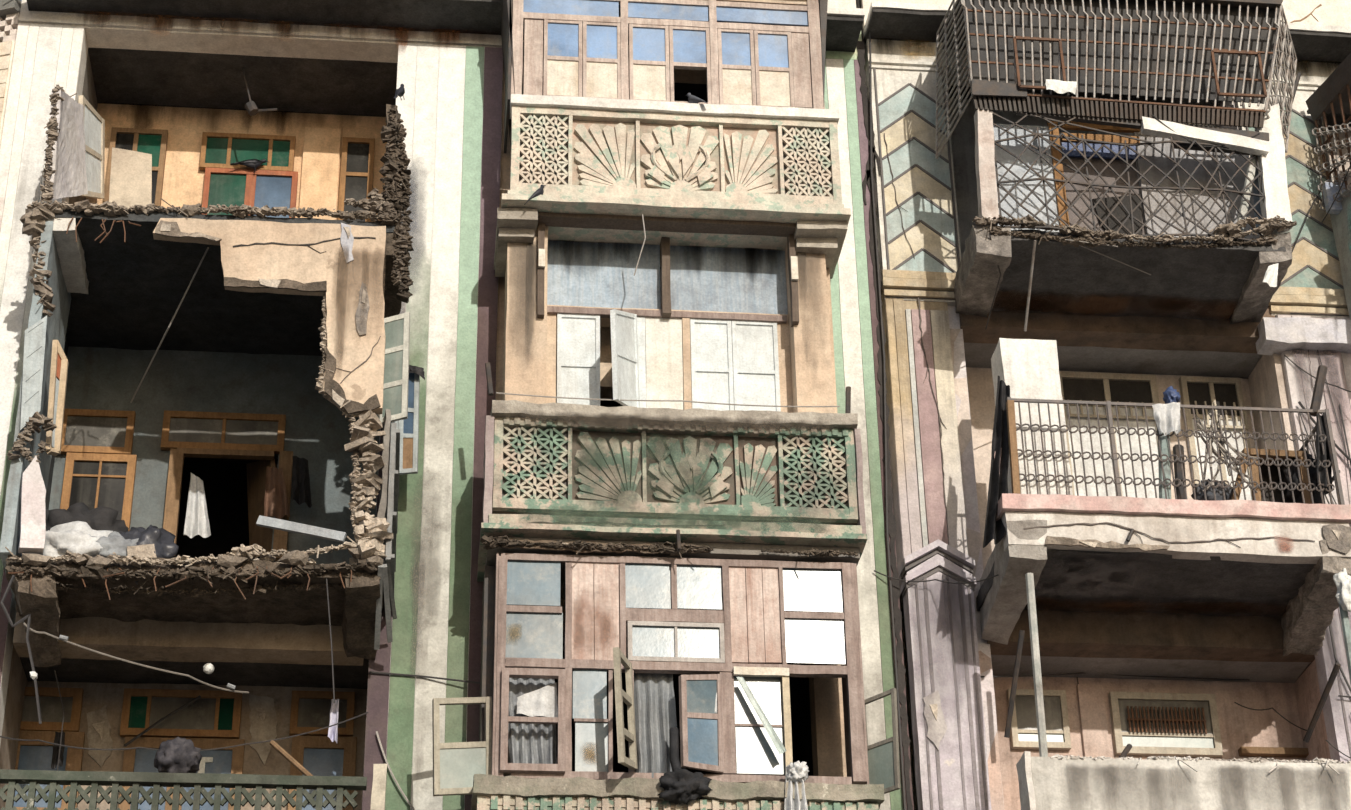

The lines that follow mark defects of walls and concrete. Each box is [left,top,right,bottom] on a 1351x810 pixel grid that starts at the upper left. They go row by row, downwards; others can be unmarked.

spalling [20,85,414,317]
crack [233,237,376,254]
spalling [972,214,1297,250]
crack [337,336,381,384]
crack [1024,522,1315,548]
spalling [5,536,378,600]